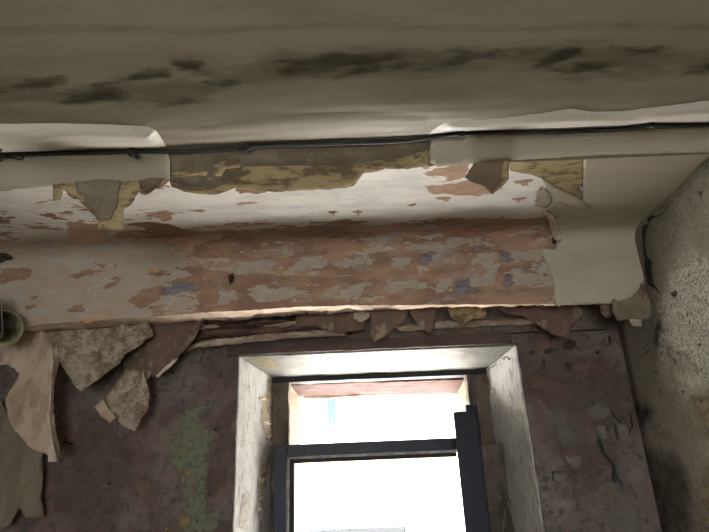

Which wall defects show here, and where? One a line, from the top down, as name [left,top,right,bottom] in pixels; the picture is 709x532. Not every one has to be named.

water stain [64,84,123,104]
water stain [130,71,169,80]
water stain [173,61,202,70]
water stain [278,53,404,75]
water stain [540,47,609,72]
peeling [421,165,492,202]
peeling [20,213,110,248]
peeling [127,210,225,252]
crack [642,166,707,293]
peeling [0,240,32,284]
peeling [23,227,613,332]
peeling [169,400,221,532]